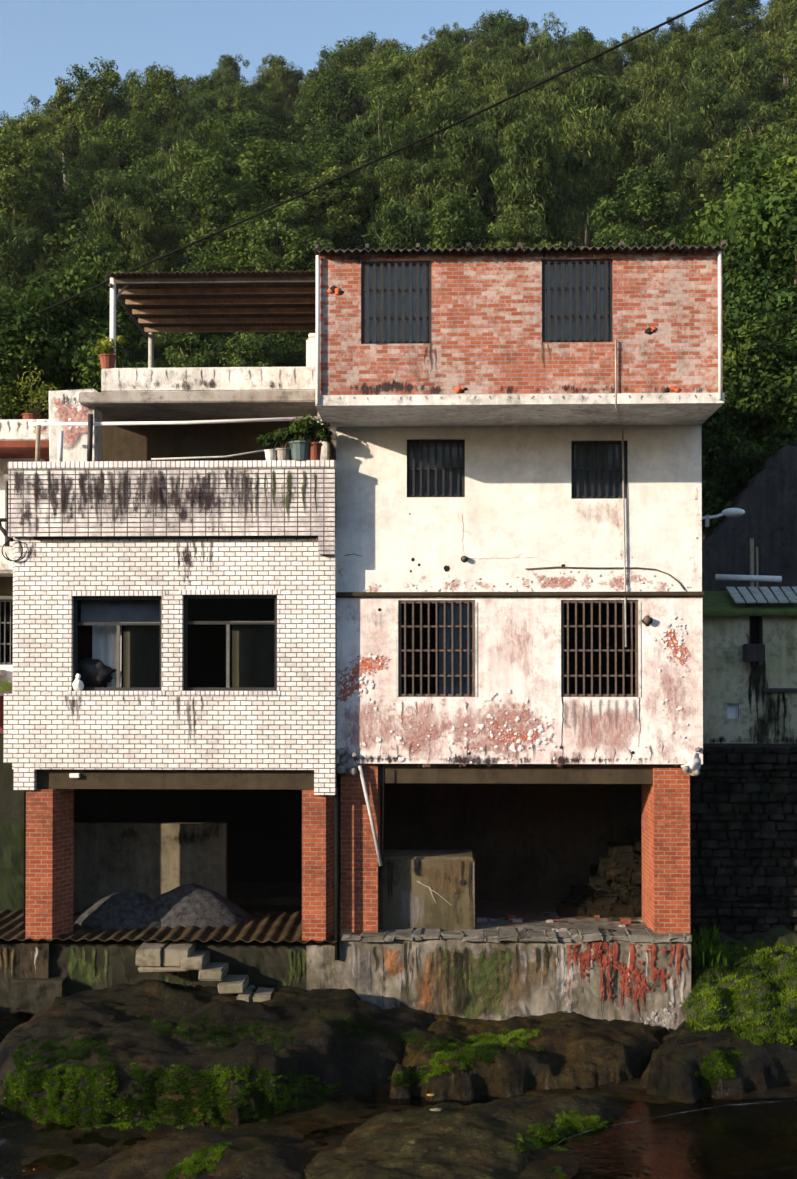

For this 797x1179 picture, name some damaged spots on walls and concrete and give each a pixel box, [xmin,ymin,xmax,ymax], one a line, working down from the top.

peeling [50,395,94,448]
damp [14,468,317,582]
peeling [397,536,701,592]
damp [176,697,203,739]
damp [339,702,535,766]
peeling [336,648,563,764]
damp [551,700,664,765]
peeling [631,615,691,762]
damp [710,661,797,744]
damp [395,941,594,1017]
peeling [565,940,687,1028]
damp [670,948,684,1009]